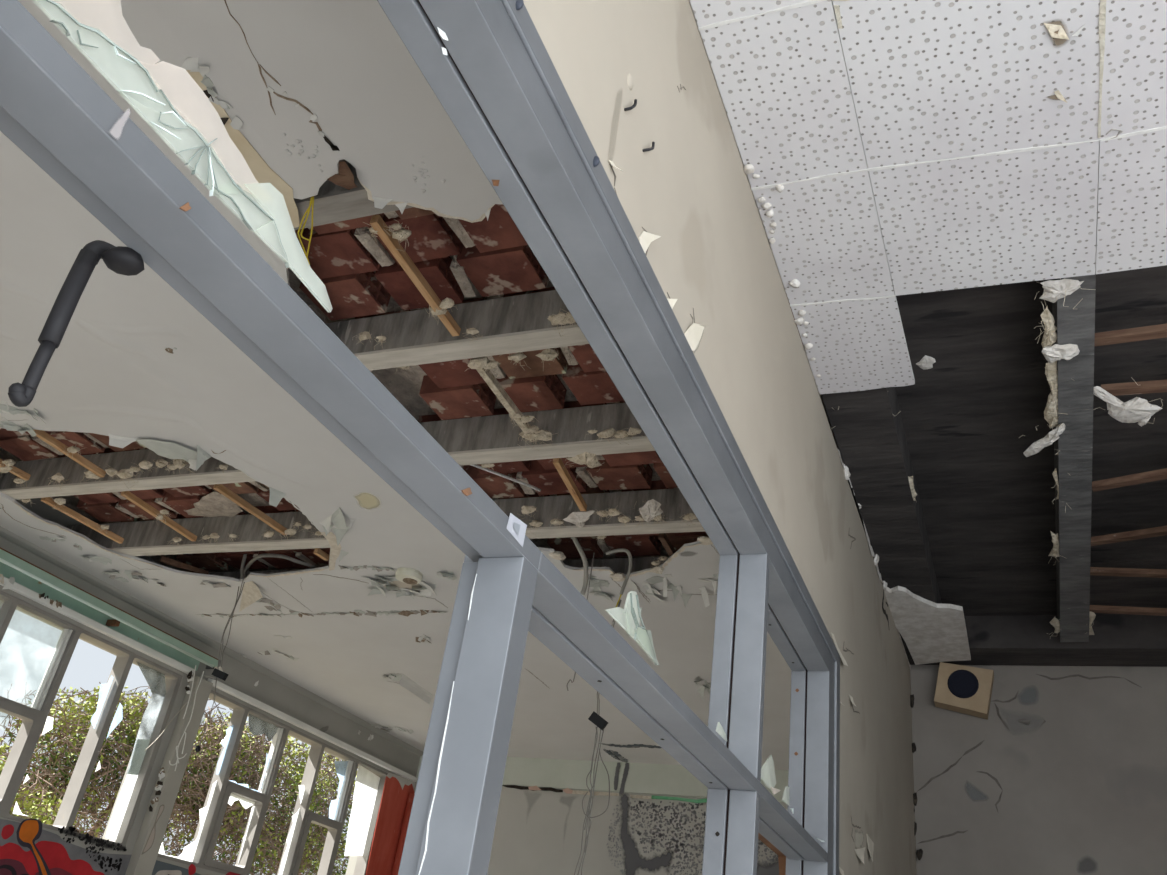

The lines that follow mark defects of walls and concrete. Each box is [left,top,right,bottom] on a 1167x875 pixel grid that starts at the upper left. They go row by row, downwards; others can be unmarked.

peeling [110,109,130,139]
peeling [181,57,300,228]
crack [224,0,357,190]
spalling [357,177,495,223]
peeling [109,434,137,448]
peeling [0,501,166,589]
peeling [549,536,718,608]
spalling [837,448,887,590]
peeling [831,633,854,666]